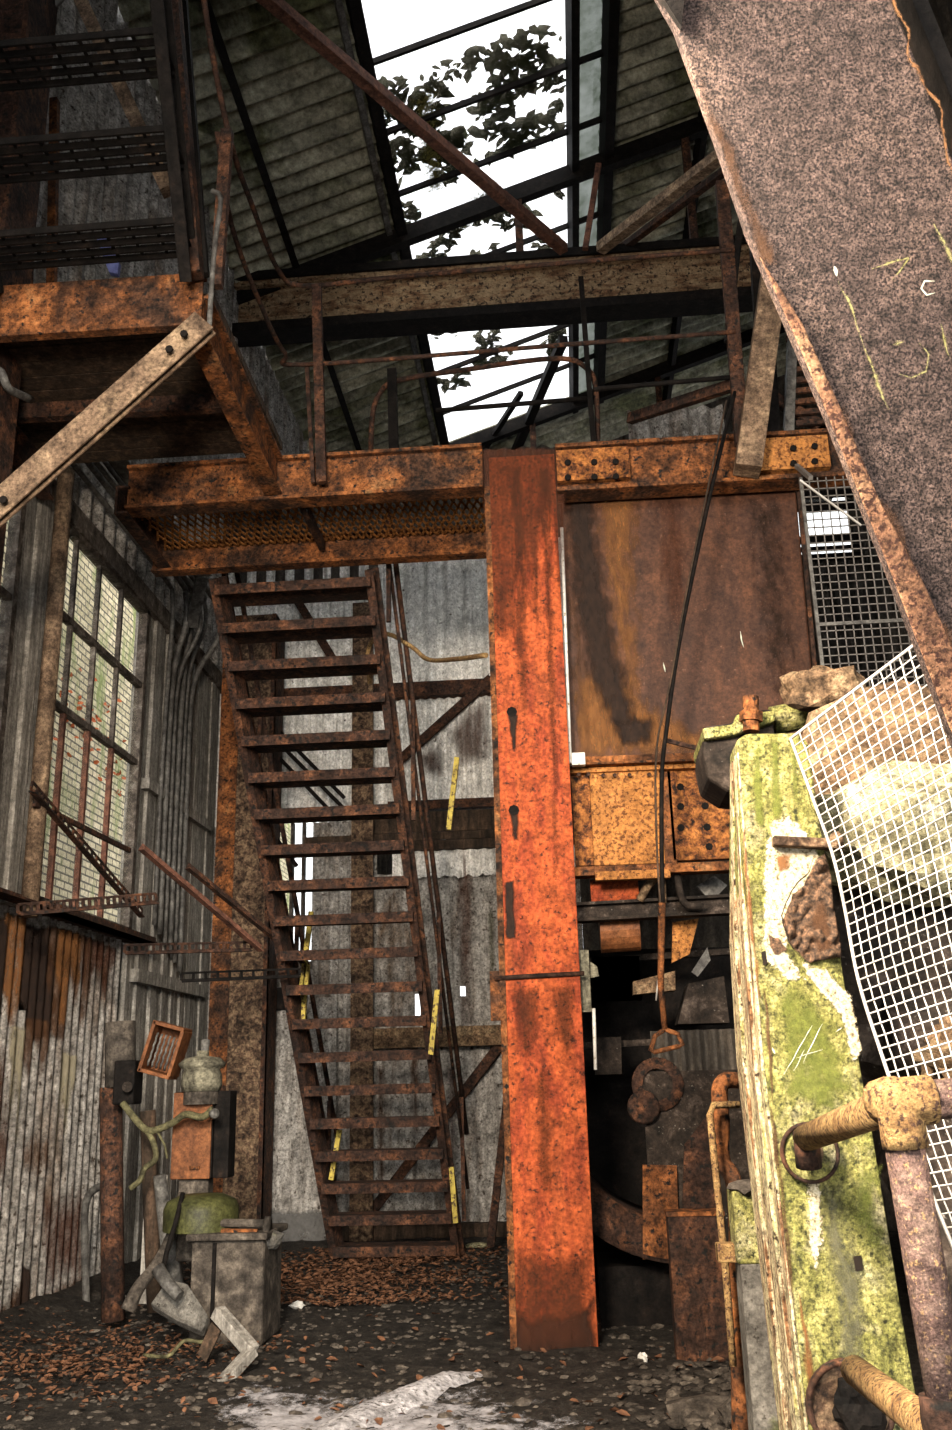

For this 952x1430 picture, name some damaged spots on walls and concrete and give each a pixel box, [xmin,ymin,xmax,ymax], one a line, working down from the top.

corrosion [572,500,700,757]
corrosion [508,715,518,749]
damp [754,743,797,825]
corrosion [510,814,518,839]
corrosion [505,881,515,938]
corrosion [2,913,26,1023]
corrosion [46,925,116,1039]
corrosion [23,1141,48,1171]
corrosion [1,1264,31,1311]
damp [807,1183,861,1357]